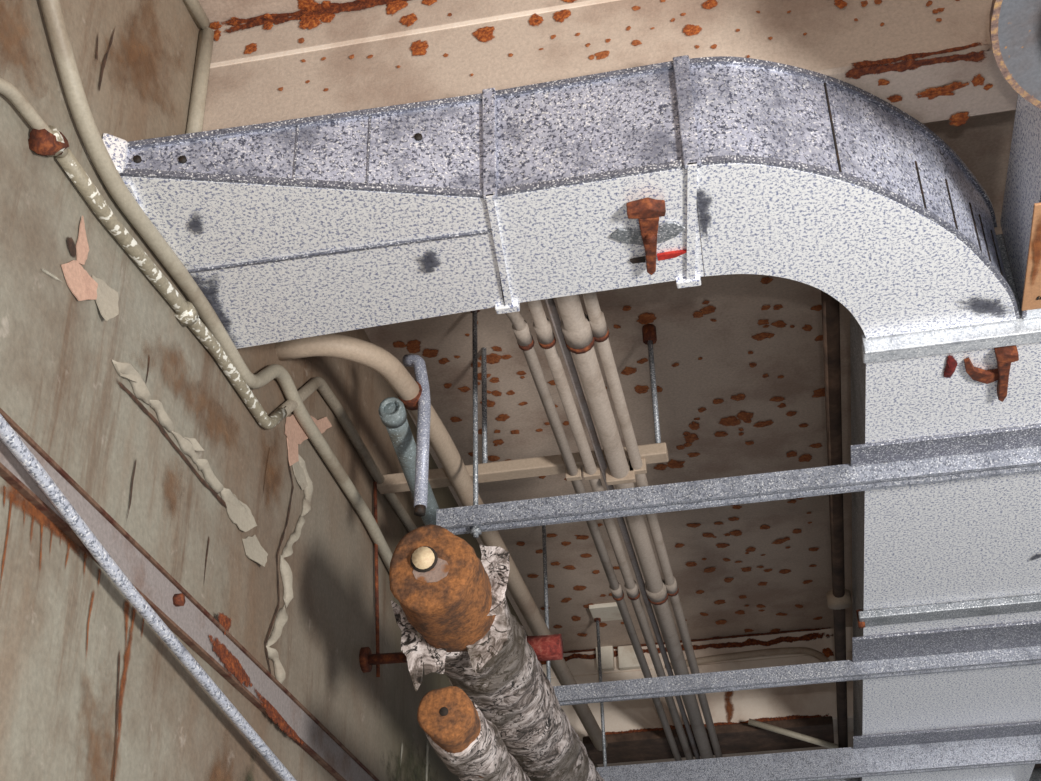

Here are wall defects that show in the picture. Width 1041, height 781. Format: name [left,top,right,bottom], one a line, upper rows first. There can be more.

rust [209,0,437,43]
rust [410,40,429,56]
rust [472,26,495,42]
rust [529,0,575,26]
rust [845,0,1041,109]
flaking render [42,216,119,321]
rust [444,324,621,462]
rust [654,394,774,470]
peeling [112,360,332,684]
rust [0,408,380,781]
rust [527,585,679,665]
rust [680,595,834,658]